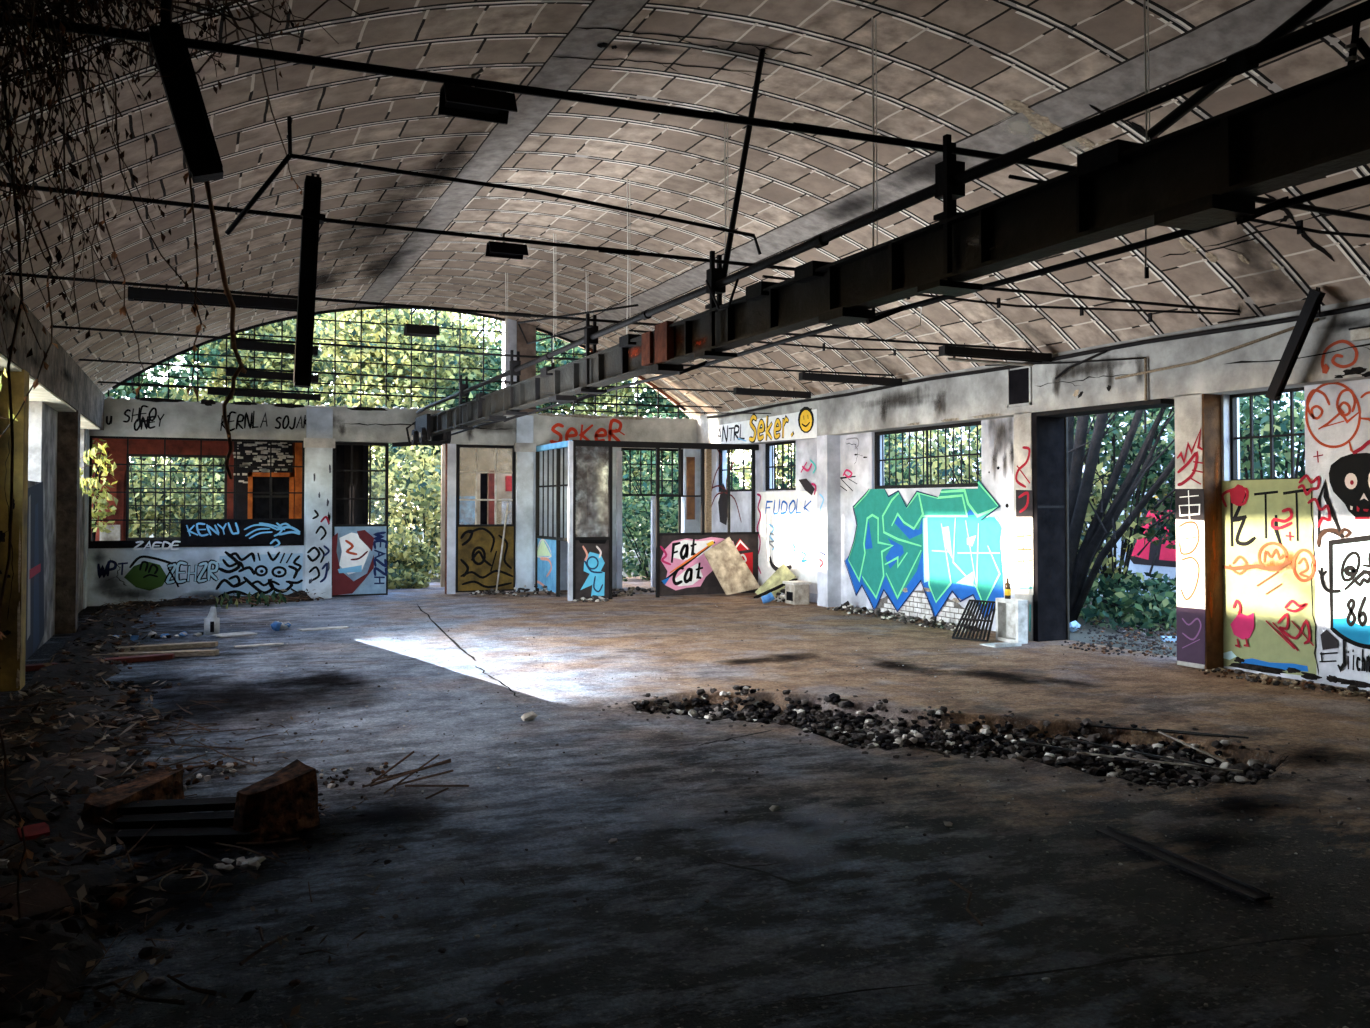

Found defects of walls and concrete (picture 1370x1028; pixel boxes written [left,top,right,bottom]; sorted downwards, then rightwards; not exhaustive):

water stain [371,253,398,275]
water stain [990,419,1014,472]
crack [418,606,530,697]